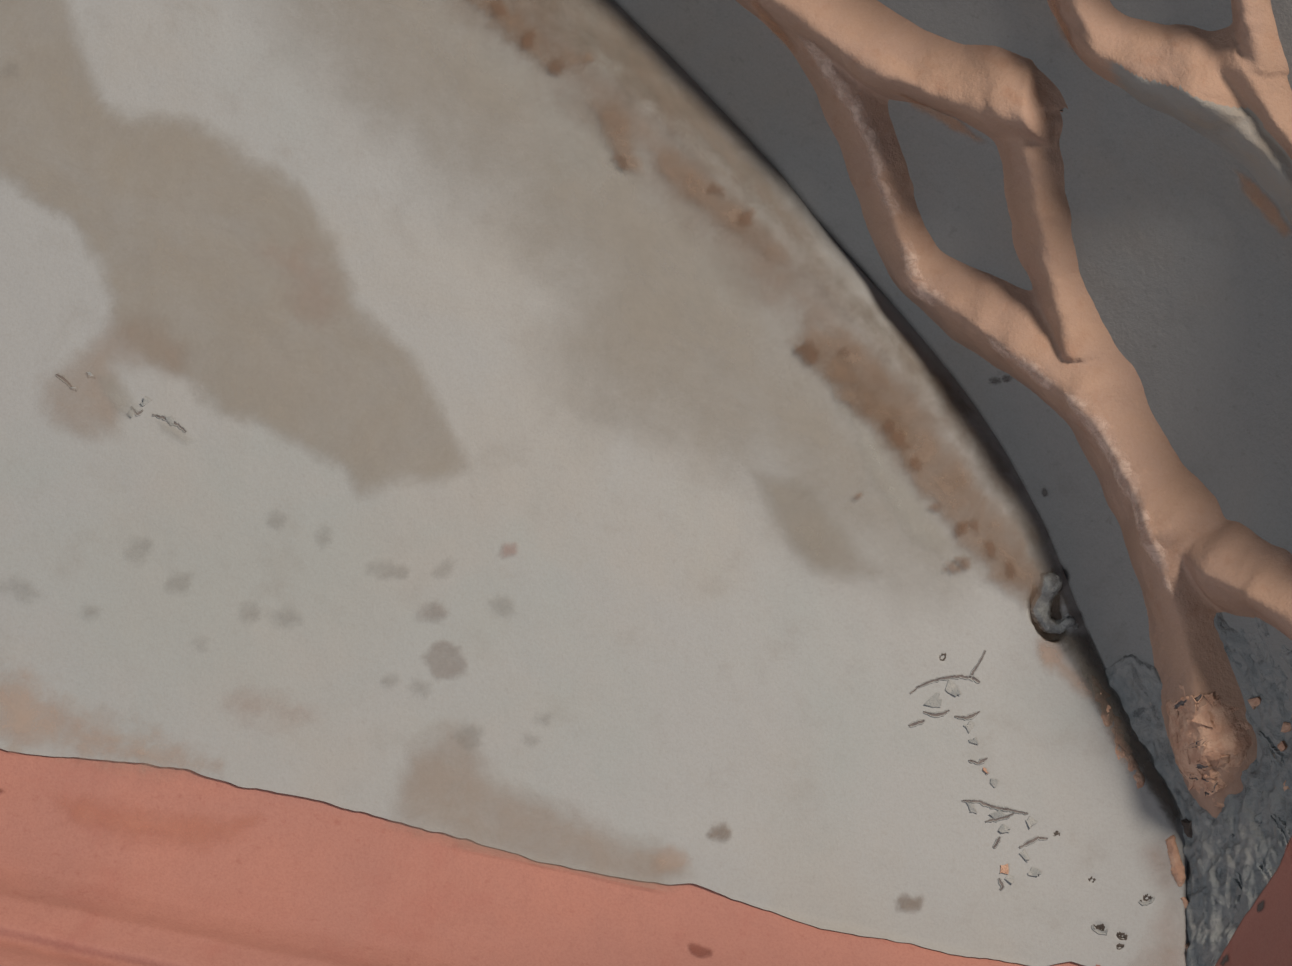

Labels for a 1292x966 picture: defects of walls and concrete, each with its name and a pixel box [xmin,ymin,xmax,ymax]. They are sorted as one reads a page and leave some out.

crack [909,650,986,733]
peeling [1084,612,1292,966]